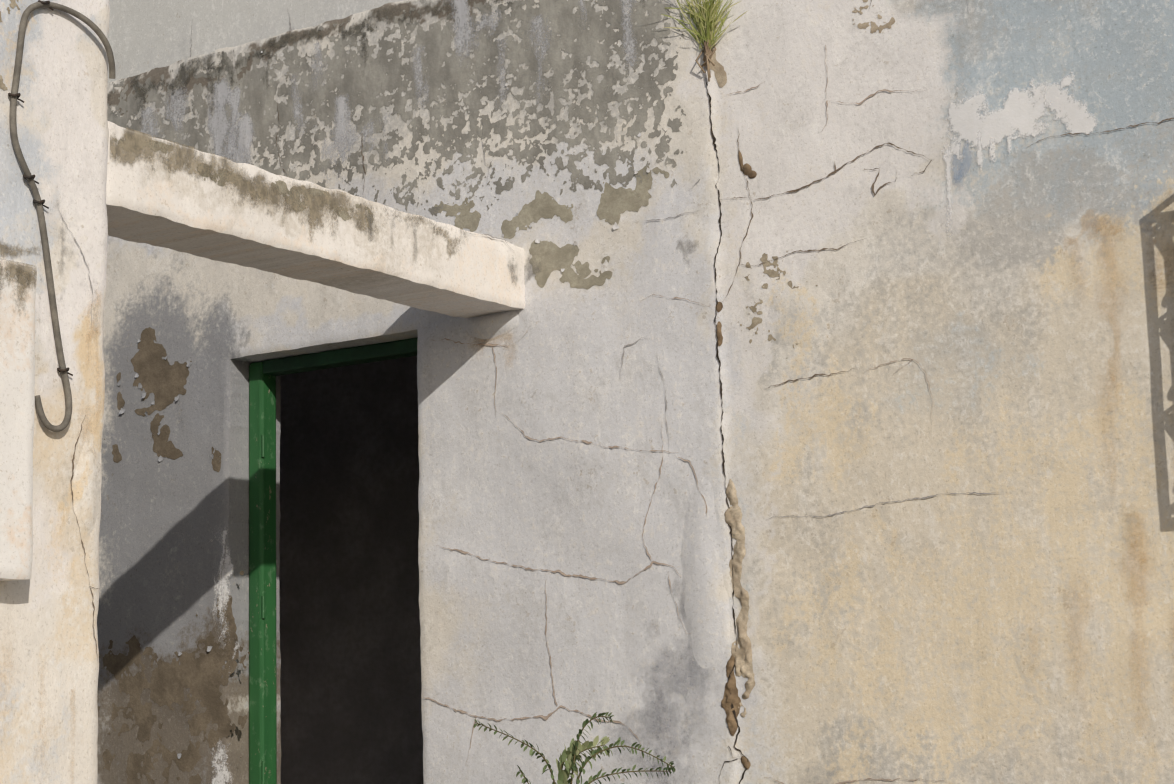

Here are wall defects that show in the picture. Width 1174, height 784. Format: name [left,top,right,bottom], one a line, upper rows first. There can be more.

peeling [107,0,686,289]
peeling [104,439,122,463]
peeling [116,327,192,462]
peeling [211,447,221,472]
crack [423,45,944,784]
crack [769,492,1006,519]
peeling [97,571,250,784]